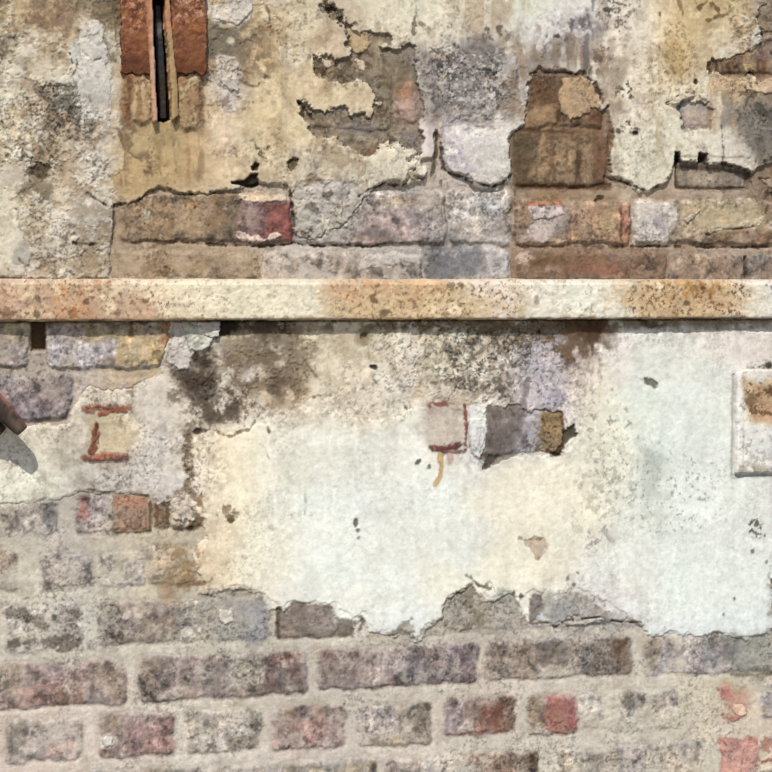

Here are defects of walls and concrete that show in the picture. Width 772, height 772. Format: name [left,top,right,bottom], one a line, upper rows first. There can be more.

spalling [666,0,772,131]
spalling [112,0,427,278]
spalling [508,66,627,192]
spalling [481,152,772,279]
peeling [167,321,220,370]
damp [168,320,317,476]
spalling [469,404,577,469]
damp [363,318,771,415]
spalling [112,495,205,535]
spalling [7,607,84,652]
peeling [160,549,365,645]
peeling [367,572,642,645]